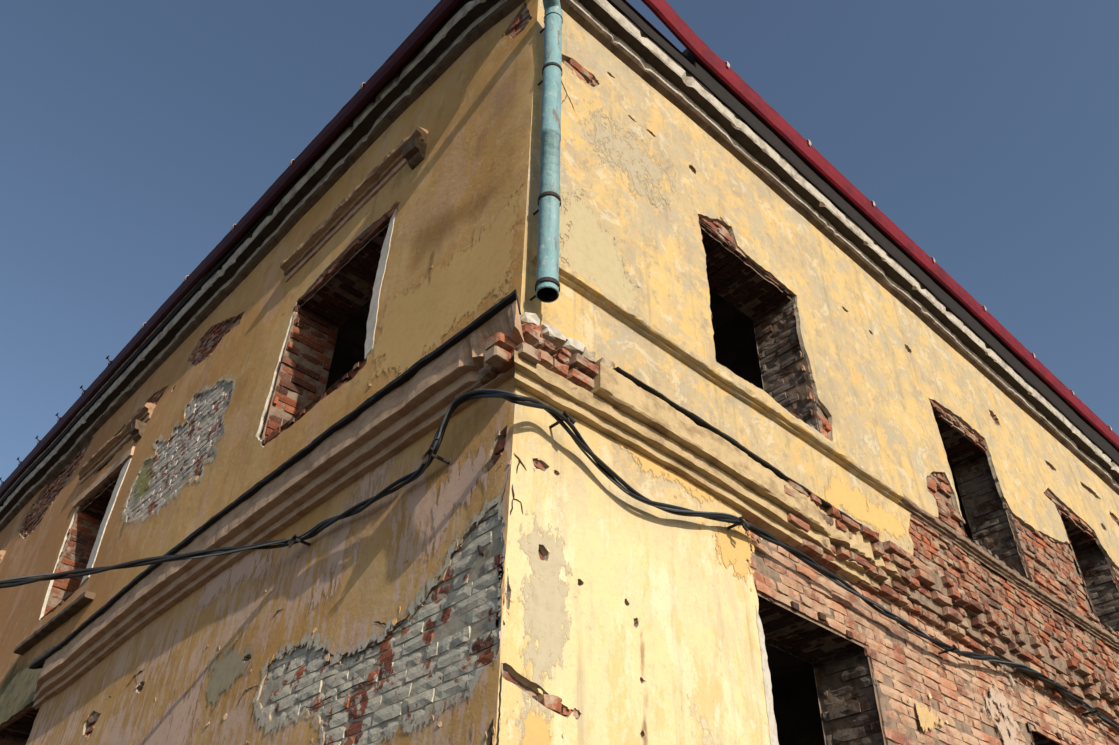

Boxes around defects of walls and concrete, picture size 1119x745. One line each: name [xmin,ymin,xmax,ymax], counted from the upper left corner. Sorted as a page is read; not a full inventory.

spalling [502,2,532,39]
spalling [562,54,614,87]
flaking render [187,302,253,366]
flaking render [90,385,168,478]
flaking render [121,372,237,527]
flaking render [137,424,582,745]
flaking render [614,398,1119,745]